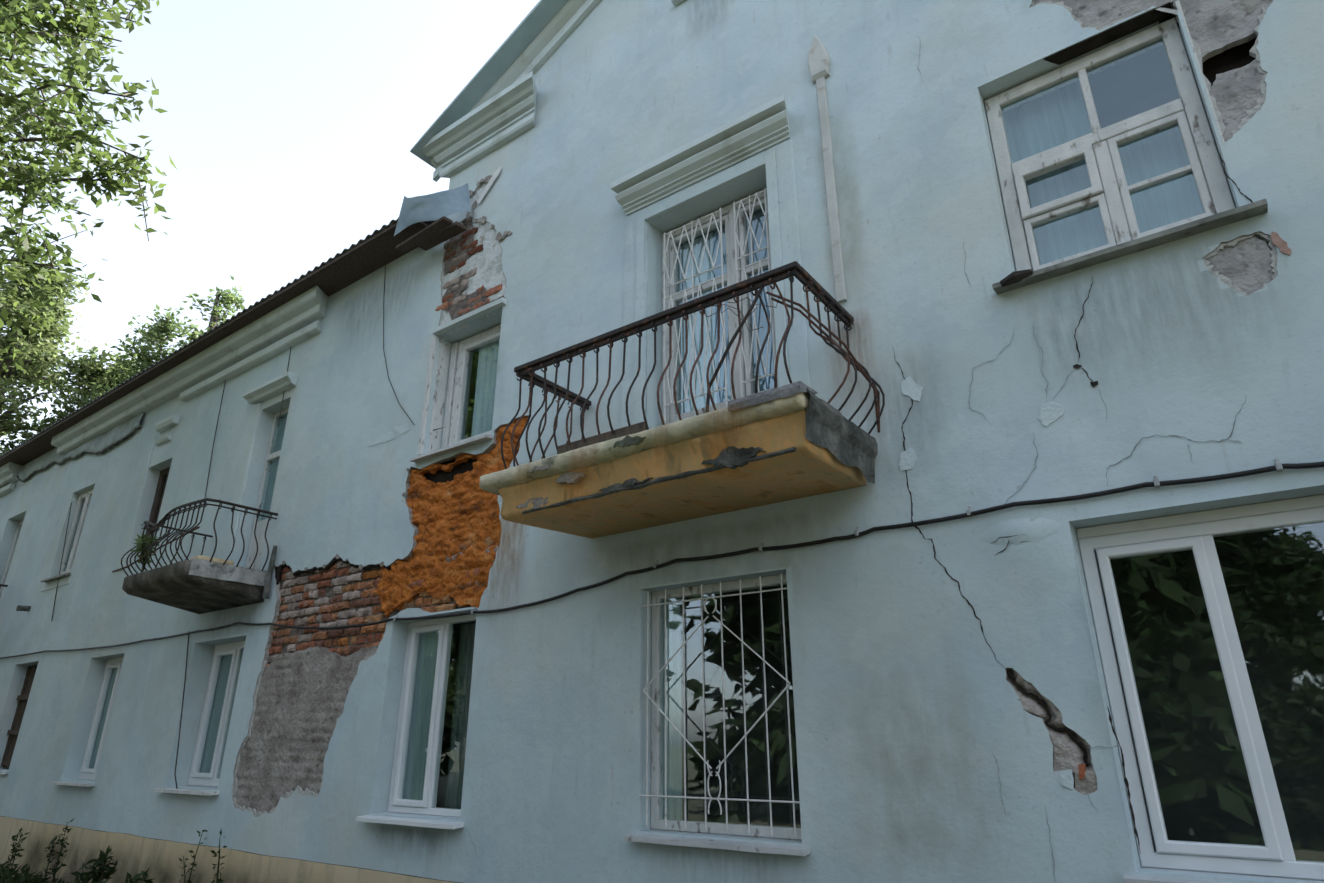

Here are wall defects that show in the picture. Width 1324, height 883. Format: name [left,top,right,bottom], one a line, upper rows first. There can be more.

flaking render [1031,0,1274,145]
flaking render [435,166,512,343]
flaking render [1203,231,1292,296]
crack [968,276,1107,425]
spalling [516,381,878,514]
crack [892,346,1004,667]
crack [1005,437,1038,504]
crack [1106,395,1246,486]
flaking render [189,416,528,817]
flaking render [1007,668,1098,795]